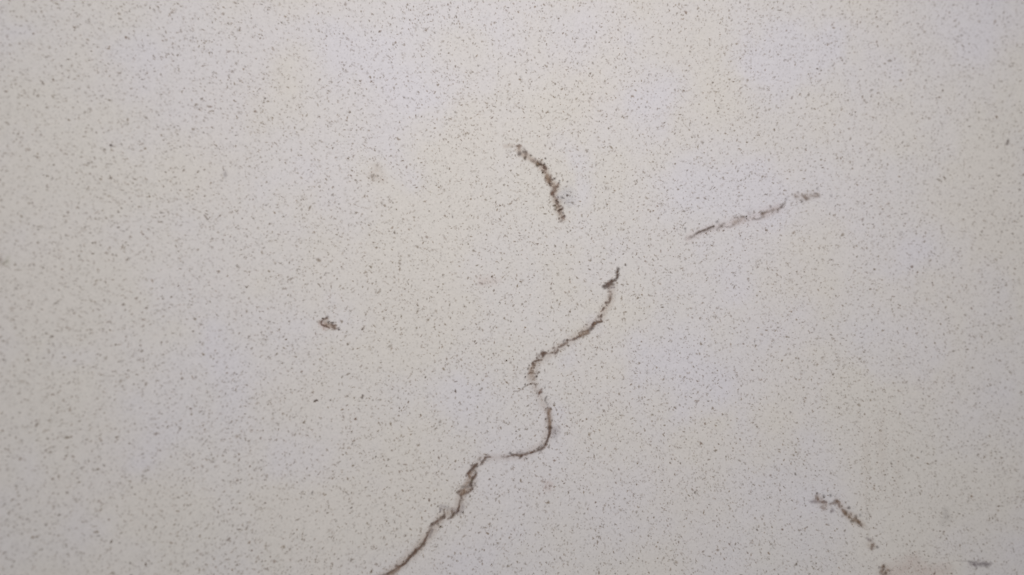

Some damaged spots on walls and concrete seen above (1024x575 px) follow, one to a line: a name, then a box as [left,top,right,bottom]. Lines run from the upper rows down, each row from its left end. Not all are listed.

crack [524,151,568,219]
crack [387,268,619,575]